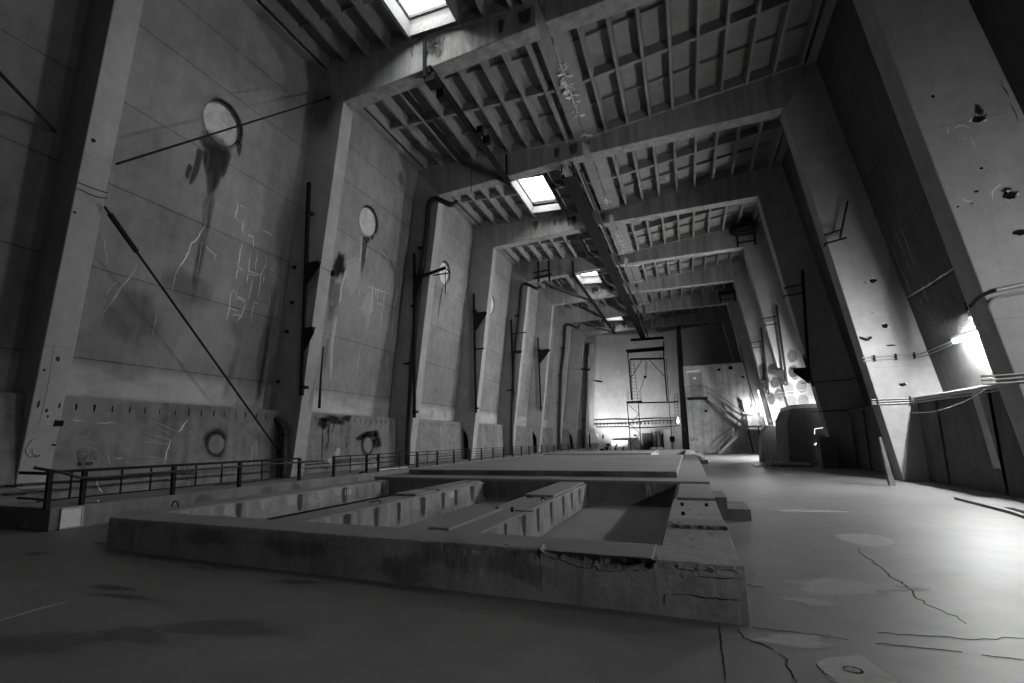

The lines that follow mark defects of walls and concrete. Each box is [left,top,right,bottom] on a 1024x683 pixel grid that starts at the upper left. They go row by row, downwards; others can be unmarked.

damp [186,98,243,194]
hole [999,190,1019,201]
crack [172,202,282,322]
damp [330,205,378,381]
damp [318,415,351,472]
crack [859,549,1024,660]
crack [738,627,849,682]